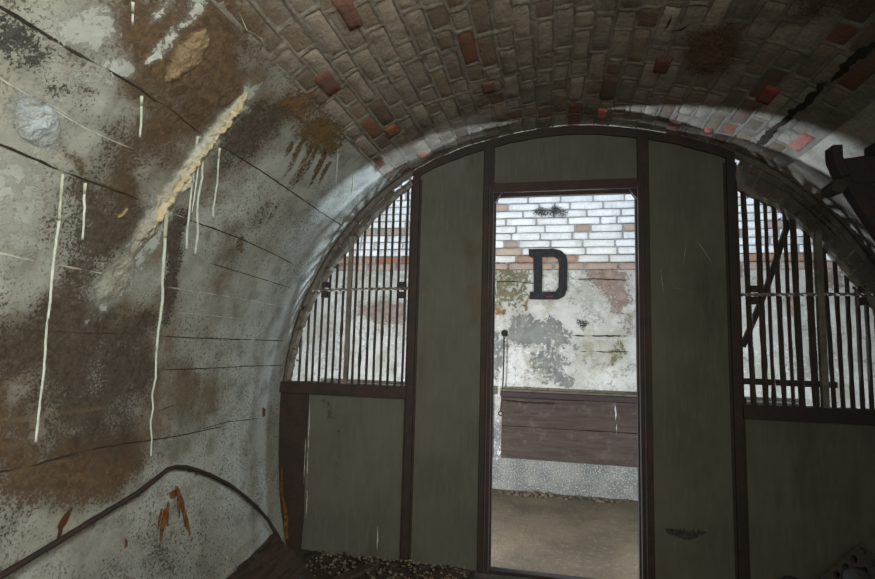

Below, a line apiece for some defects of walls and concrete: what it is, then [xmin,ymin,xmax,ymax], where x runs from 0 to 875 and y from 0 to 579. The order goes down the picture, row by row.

crack [0,5,342,226]
rust [282,138,332,192]
crack [175,214,293,264]
damp [0,0,349,579]
crack [0,418,259,473]
rust [57,507,72,538]
rust [158,486,191,542]